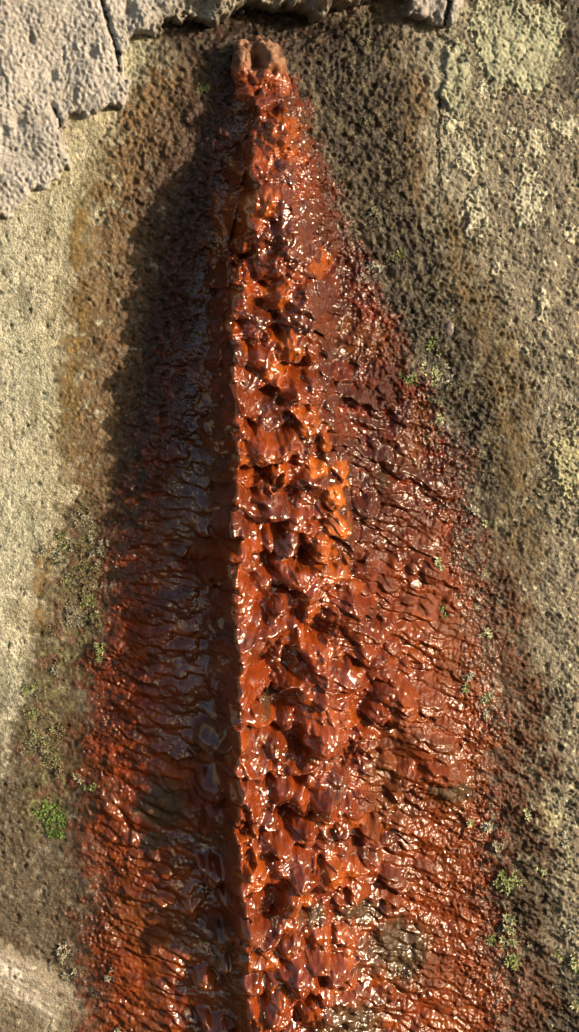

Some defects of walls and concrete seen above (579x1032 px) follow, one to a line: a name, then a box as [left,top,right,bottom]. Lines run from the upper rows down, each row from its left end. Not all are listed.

crack [93,0,121,69]
peeling [0,0,372,220]
peeling [400,0,566,122]
water stain [531,0,579,104]
corrosion [33,549,53,637]
corrosion [56,35,533,1032]
corrosion [481,393,545,563]
corrosion [486,588,551,718]
corrosion [502,711,561,789]
corrosion [501,778,550,870]
water stain [494,823,579,1032]
corrosion [516,954,560,1032]